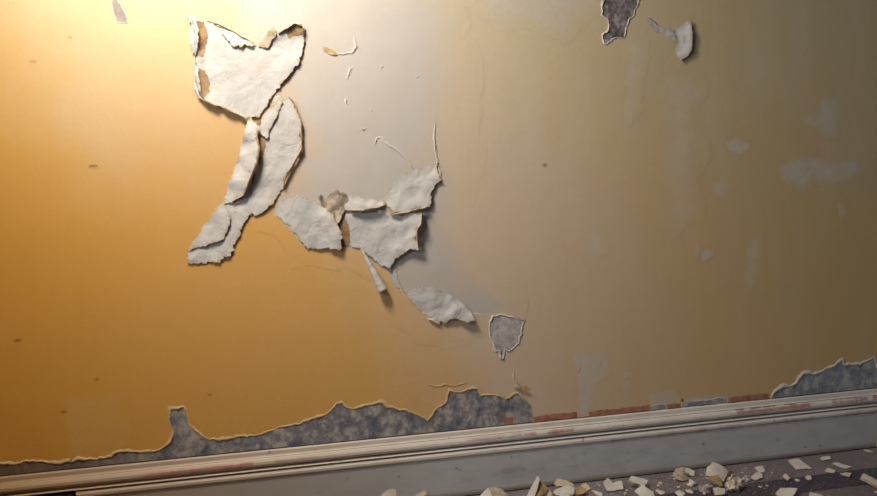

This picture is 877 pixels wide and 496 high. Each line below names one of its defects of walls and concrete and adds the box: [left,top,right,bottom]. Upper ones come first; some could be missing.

spalling [111,0,129,24]
spalling [601,0,640,45]
peeling [647,18,693,61]
peeling [186,0,528,363]
spalling [0,372,534,480]
spalling [681,356,877,426]